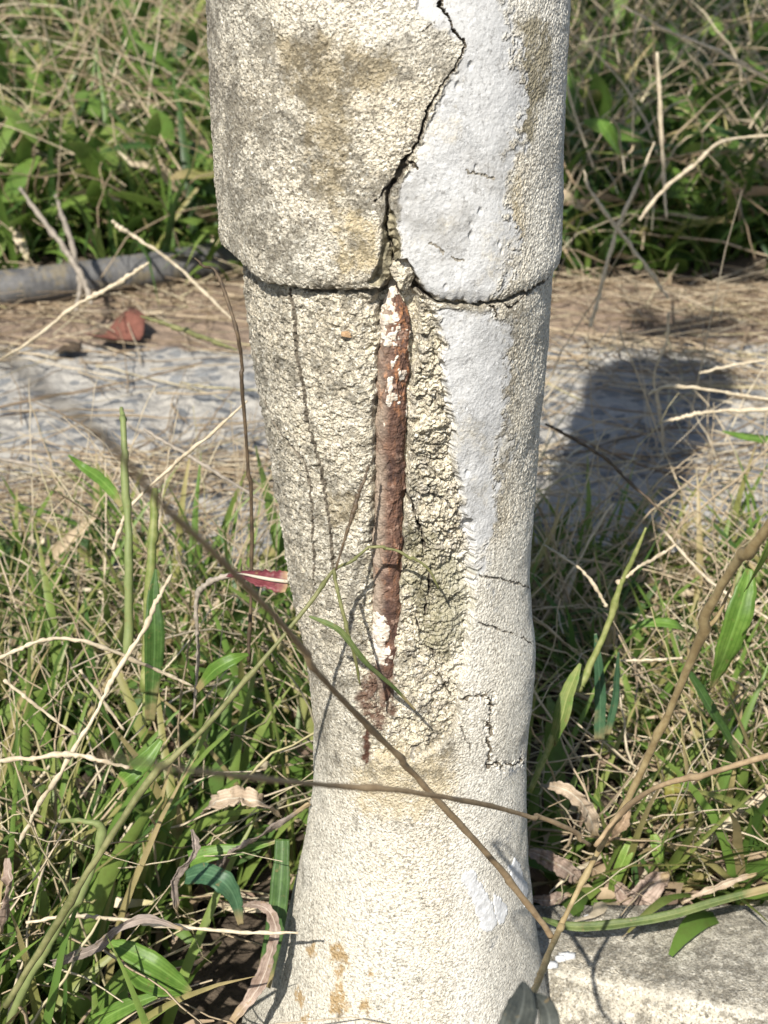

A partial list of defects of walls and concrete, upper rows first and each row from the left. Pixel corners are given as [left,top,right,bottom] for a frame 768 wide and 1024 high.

corrosion [352,657,405,765]
crack [254,0,548,594]
peeling [341,0,532,757]
crack [405,490,532,771]